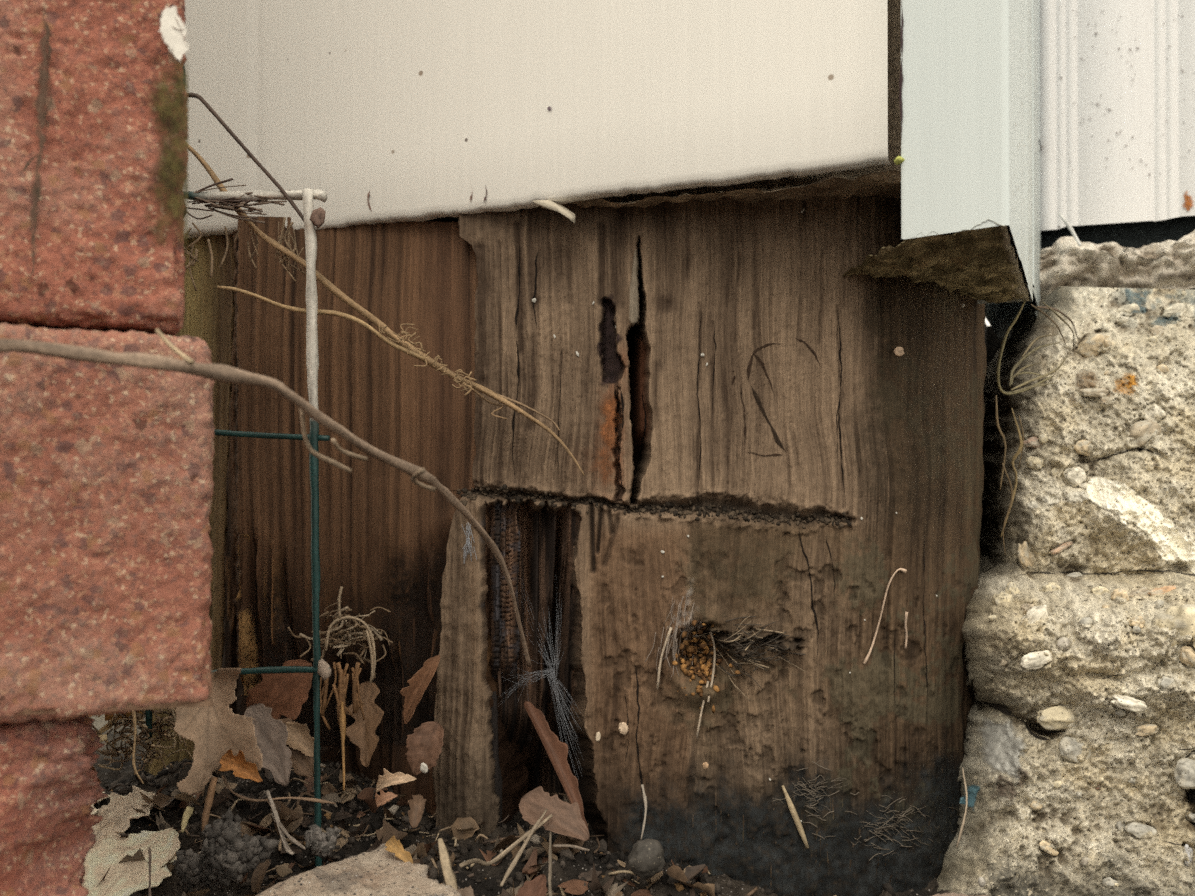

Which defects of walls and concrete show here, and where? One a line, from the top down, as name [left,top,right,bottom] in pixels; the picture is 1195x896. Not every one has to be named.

crack [614,322,647,487]
crack [1018,569,1195,577]
leakage [618,756,961,896]